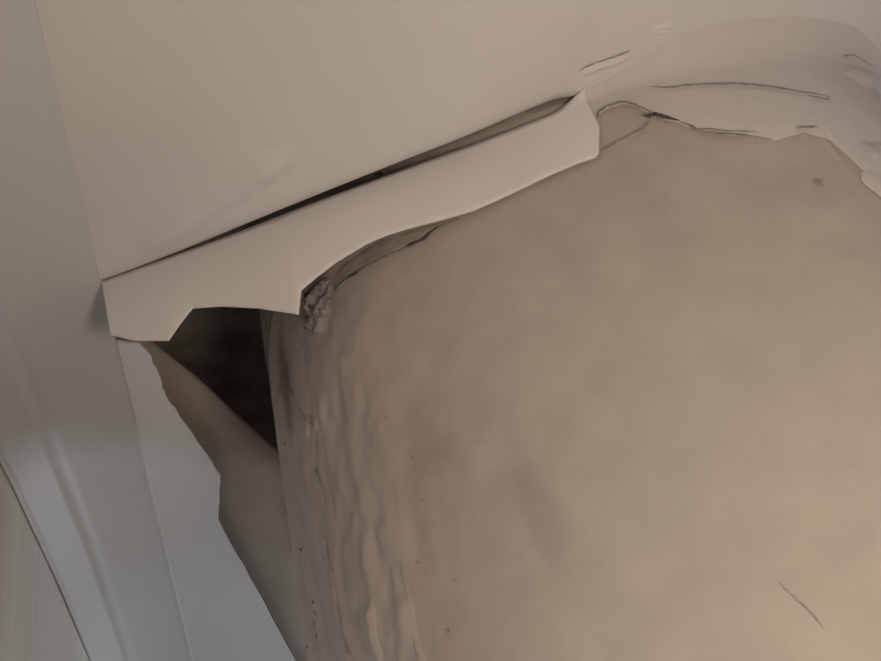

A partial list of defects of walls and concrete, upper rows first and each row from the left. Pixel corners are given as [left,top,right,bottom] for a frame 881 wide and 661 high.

crack [652,83,830,100]
crack [597,101,773,153]
peeling [101,87,599,449]